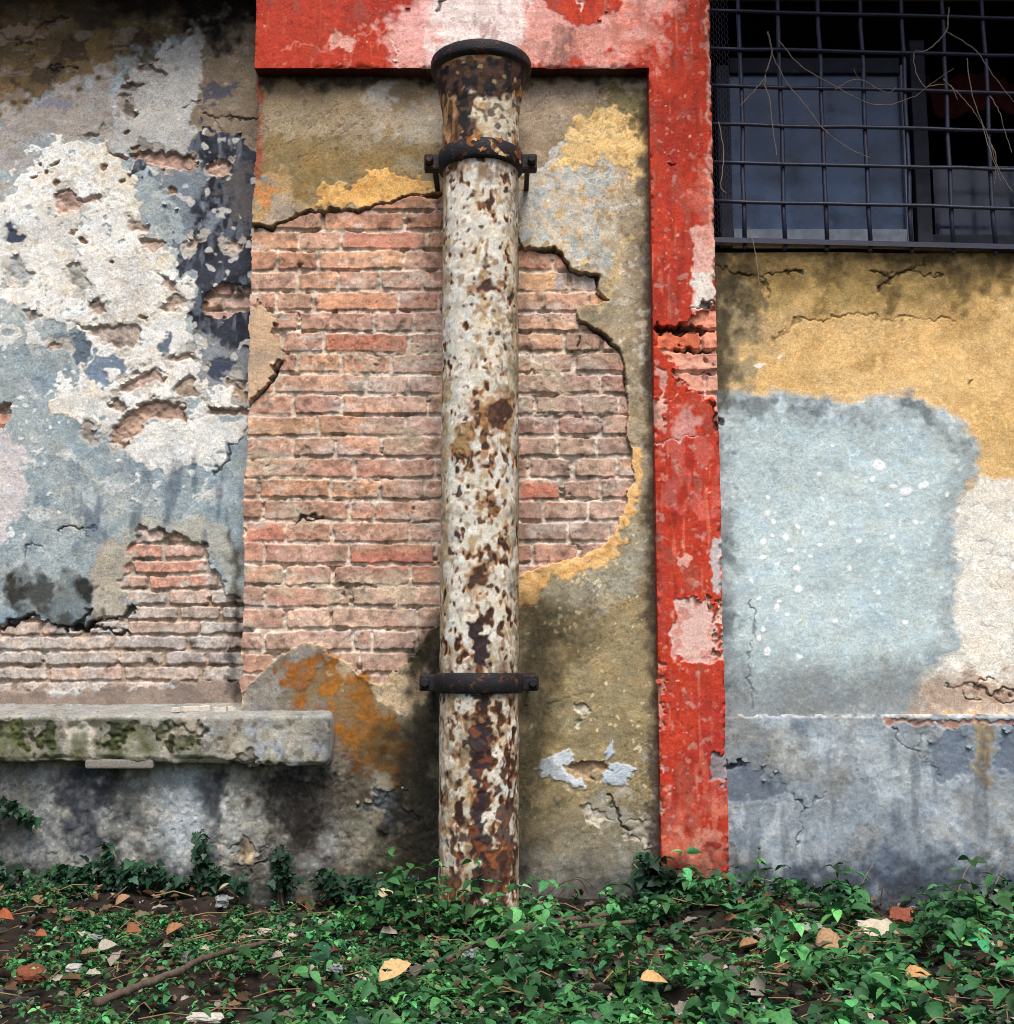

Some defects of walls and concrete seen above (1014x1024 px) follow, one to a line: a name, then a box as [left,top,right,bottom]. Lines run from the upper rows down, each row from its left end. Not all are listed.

crack [763,268,804,291]
flaking render [0,61,443,712]
corrosion [451,398,514,470]
flaking render [518,244,636,577]
flaking render [653,306,718,433]
corrosion [468,550,488,589]
corrosion [466,619,493,668]
peeling [669,593,722,664]
crack [964,653,1014,703]
crack [726,758,743,770]
damp [1,763,369,907]
corrosion [443,713,519,912]